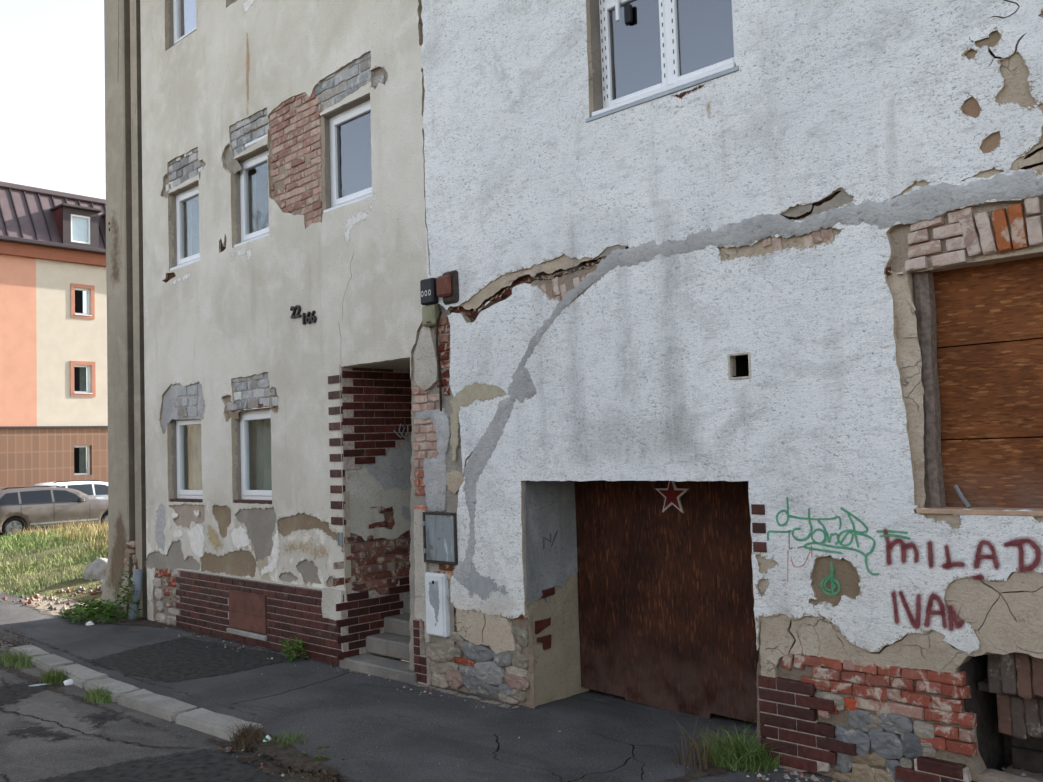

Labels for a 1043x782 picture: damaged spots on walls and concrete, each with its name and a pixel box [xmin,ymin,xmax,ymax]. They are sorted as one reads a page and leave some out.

flaking render [961,25,1043,111]
flaking render [221,52,388,227]
flaking render [960,95,983,121]
flaking render [1010,127,1043,175]
crack [785,194,837,220]
flaking render [905,207,998,273]
crack [450,245,629,320]
flaking render [223,372,279,422]
flaking render [409,305,535,708]
flaking render [119,501,348,625]
flaking render [755,552,1043,782]
crack [0,678,198,748]